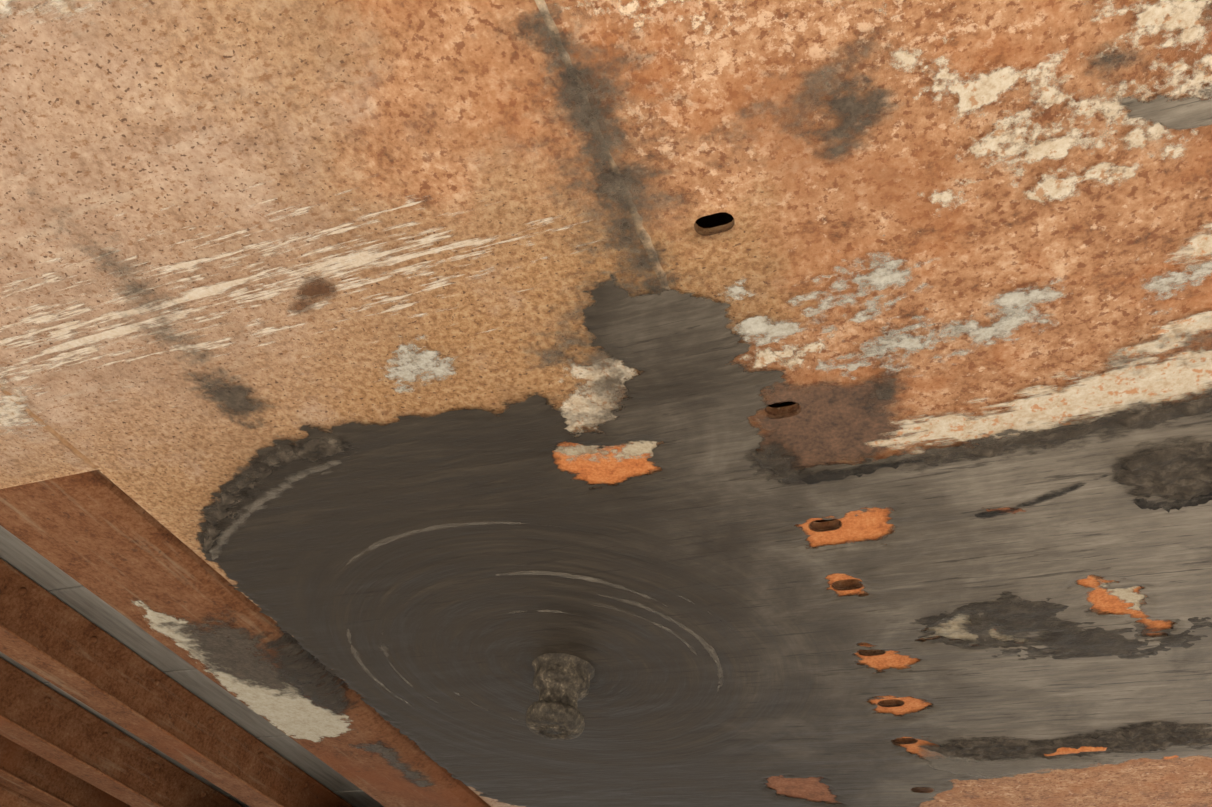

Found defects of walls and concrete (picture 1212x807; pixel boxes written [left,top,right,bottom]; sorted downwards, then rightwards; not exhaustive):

leakage [291,279,334,313]
peeling [990,280,1065,332]
rust [552,440,658,485]
rust [797,507,894,547]
rust [1077,575,1172,637]
leakage [159,615,299,696]
rust [764,775,842,804]